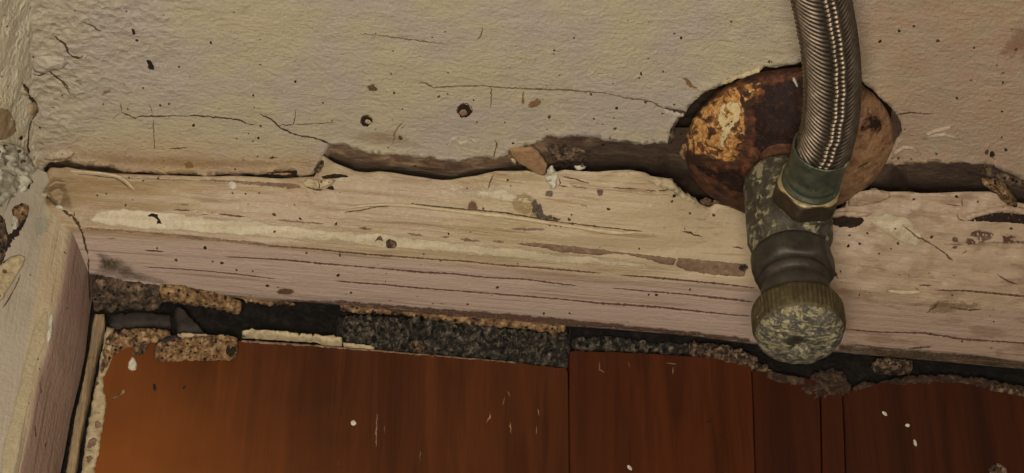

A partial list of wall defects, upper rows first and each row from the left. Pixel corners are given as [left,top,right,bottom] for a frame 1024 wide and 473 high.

crack [113,106,337,149]
crack [421,82,686,114]
spalling [668,63,803,144]
corrosion [687,80,803,192]
corrosion [861,112,882,132]
spalling [862,82,892,118]
crack [546,176,589,189]
spalling [636,169,723,207]